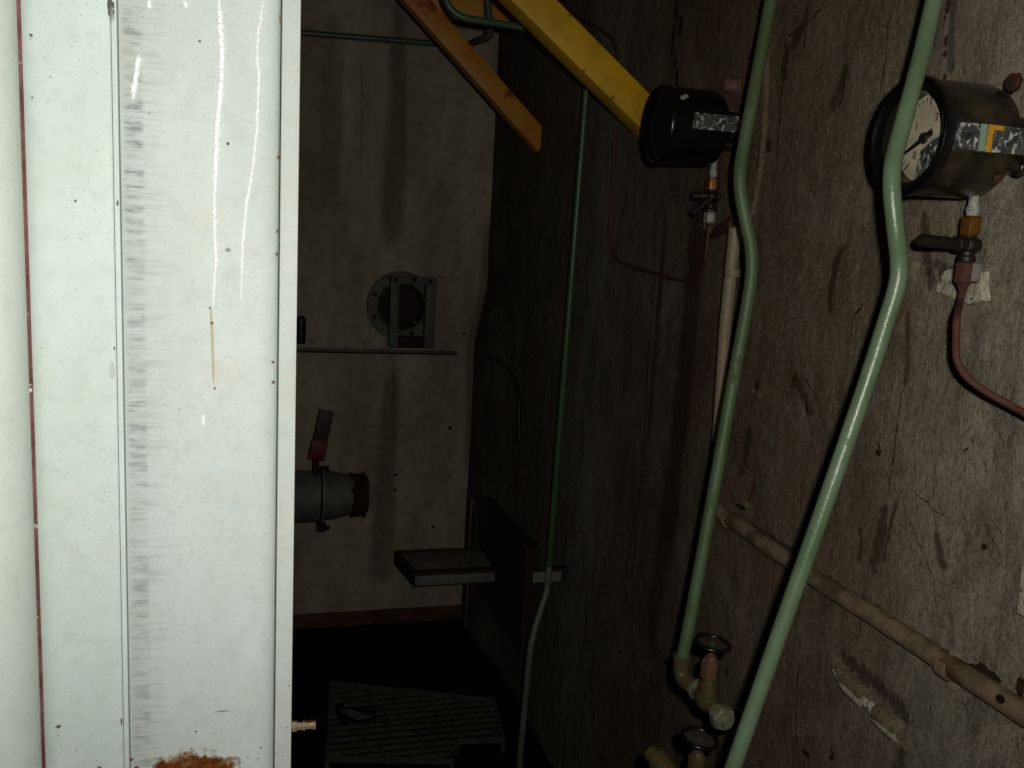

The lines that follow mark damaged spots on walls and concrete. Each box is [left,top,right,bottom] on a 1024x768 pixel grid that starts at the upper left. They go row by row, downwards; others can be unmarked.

crack [884,369,950,630]